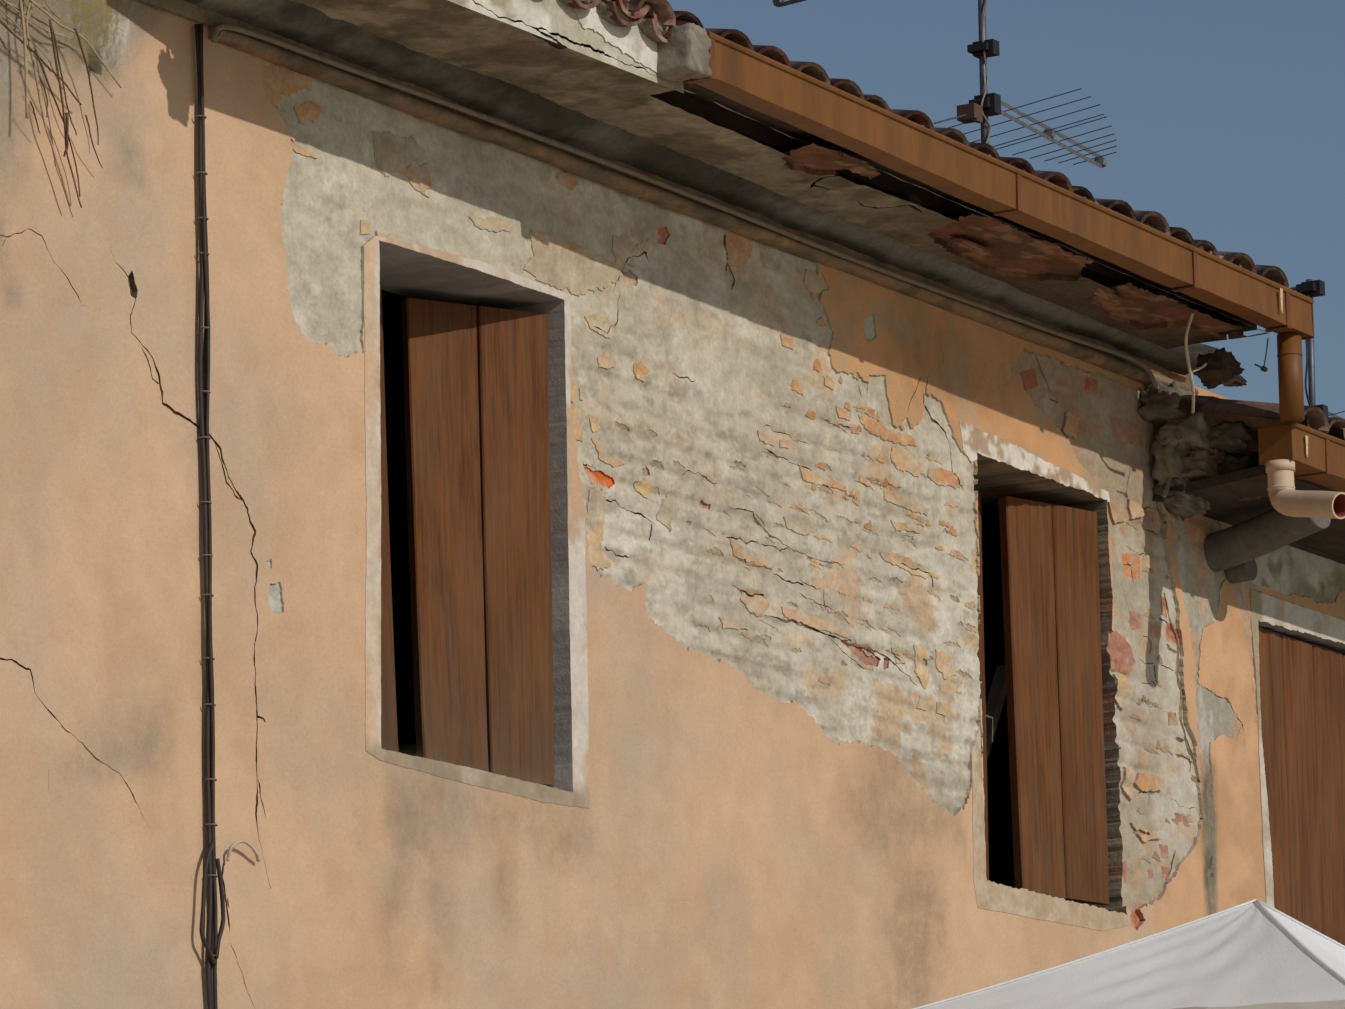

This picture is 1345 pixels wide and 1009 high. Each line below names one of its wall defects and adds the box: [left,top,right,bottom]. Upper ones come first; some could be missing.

crack [473,0,658,78]
crack [0,229,83,306]
peeling [950,237,993,257]
peeling [261,62,983,816]
crack [110,247,271,889]
peeling [1010,348,1345,931]
crack [0,658,149,827]
leakage [1204,771,1217,914]
crack [217,862,255,1007]